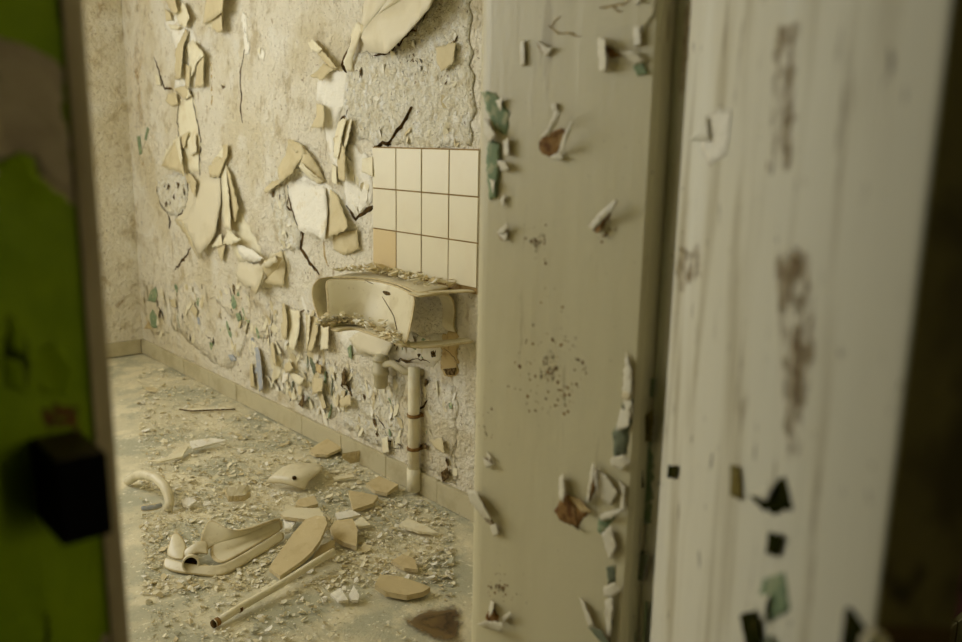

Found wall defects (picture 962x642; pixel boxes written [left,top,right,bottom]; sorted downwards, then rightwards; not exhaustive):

peeling [597,0,657,76]
peeling [0,38,77,218]
peeling [539,102,573,161]
peeling [588,199,618,233]
flaking render [143,0,510,536]
peeling [554,351,634,642]
peeling [638,409,654,581]
peeling [667,464,679,479]
peeling [730,464,793,515]
peeling [766,532,784,556]
peeling [477,601,512,632]